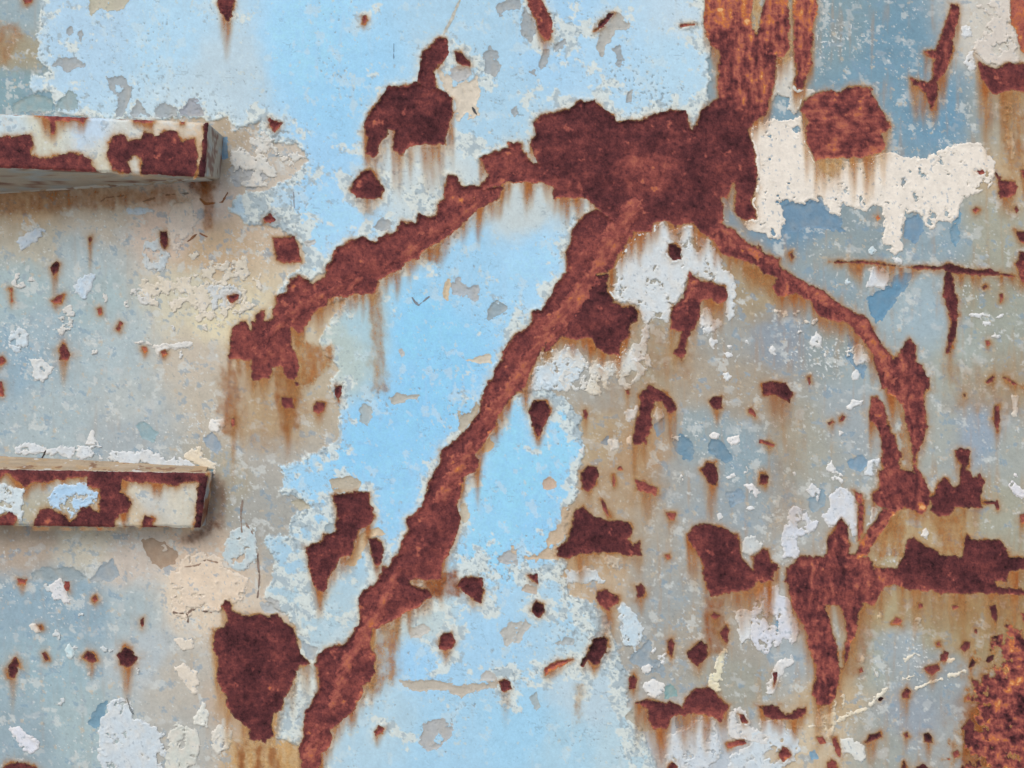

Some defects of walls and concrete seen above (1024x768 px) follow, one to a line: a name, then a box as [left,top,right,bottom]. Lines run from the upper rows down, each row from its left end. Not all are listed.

rust [0,134,97,172]
rust [35,116,88,137]
rust [106,120,213,227]
peeling [744,57,996,324]
peeling [124,198,262,359]
rust [212,0,1024,768]
rust [0,469,210,535]
peeling [141,525,258,622]
peeling [88,637,233,768]